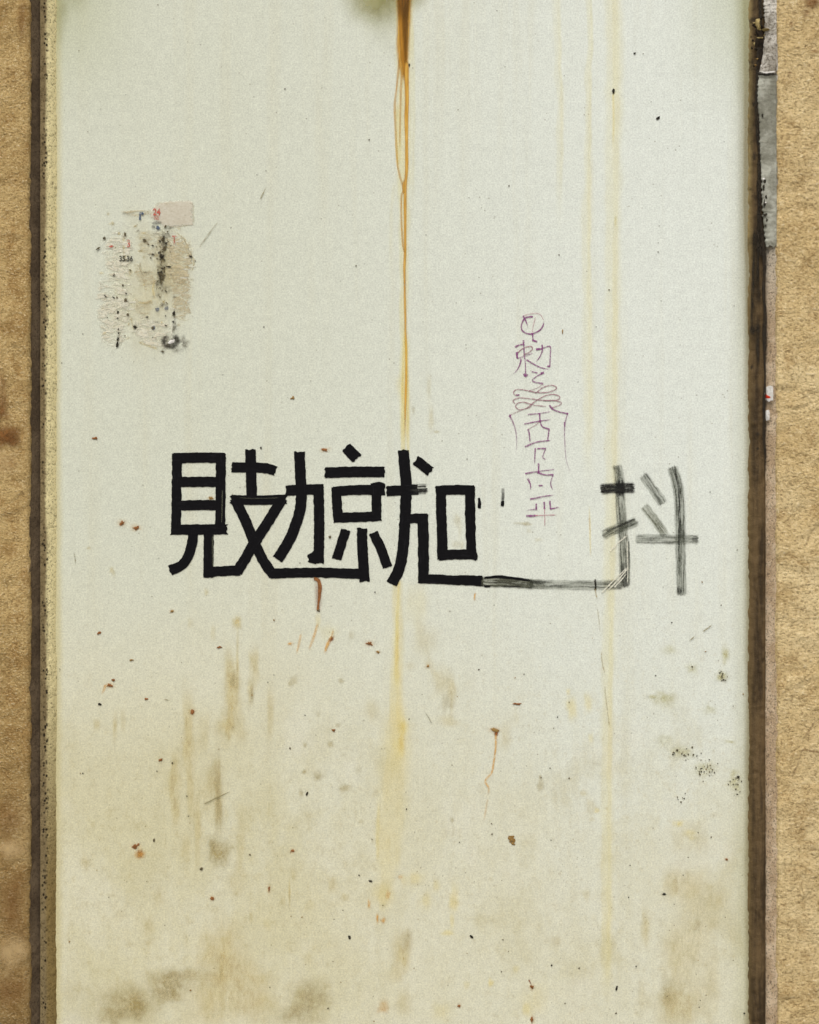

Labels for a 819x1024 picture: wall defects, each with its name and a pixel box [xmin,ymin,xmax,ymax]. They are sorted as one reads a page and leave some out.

rust [397,0,410,420]
rust [314,577,322,612]